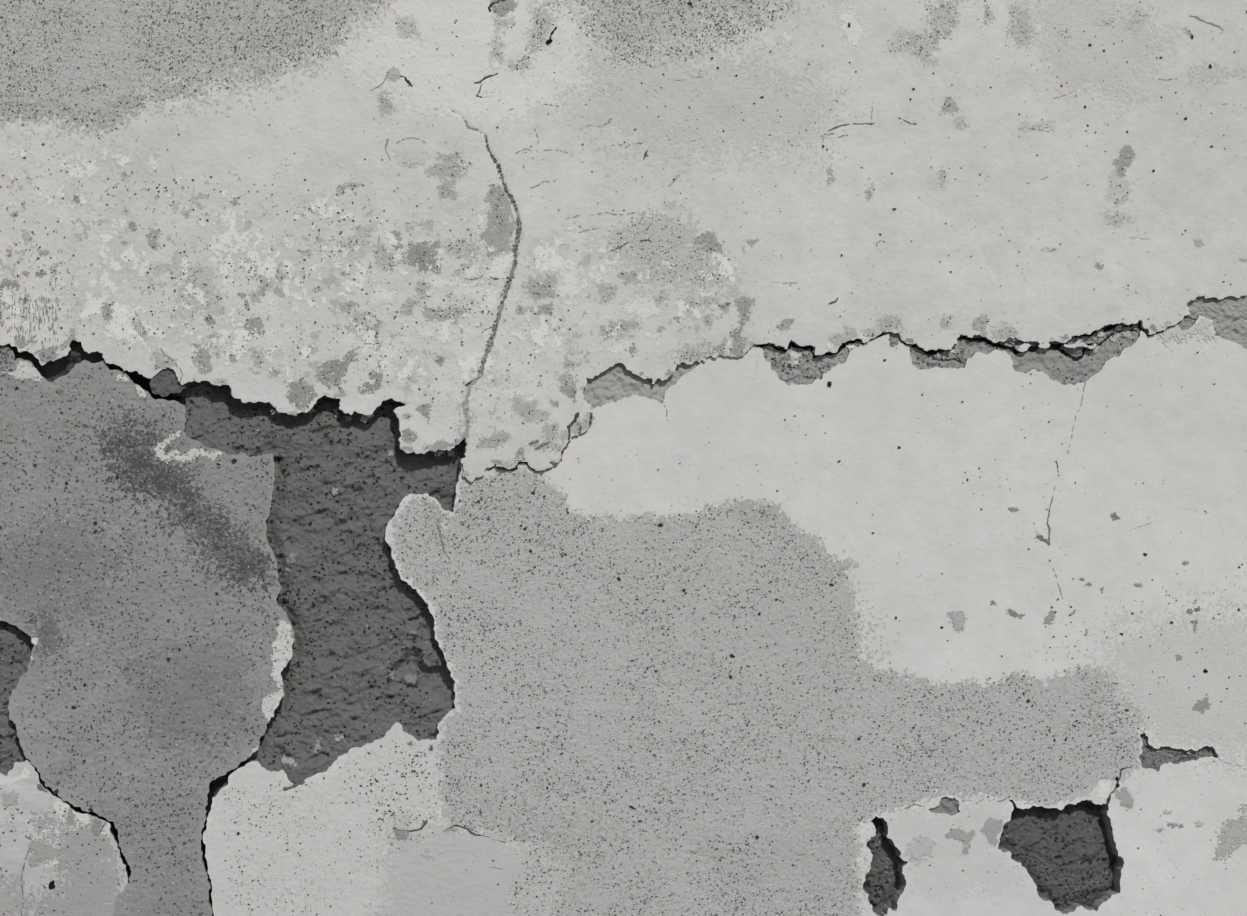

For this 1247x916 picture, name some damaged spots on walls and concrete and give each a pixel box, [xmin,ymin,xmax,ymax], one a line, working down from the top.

crack [446,27,648,472]
crack [39,773,131,881]
crack [201,787,214,916]